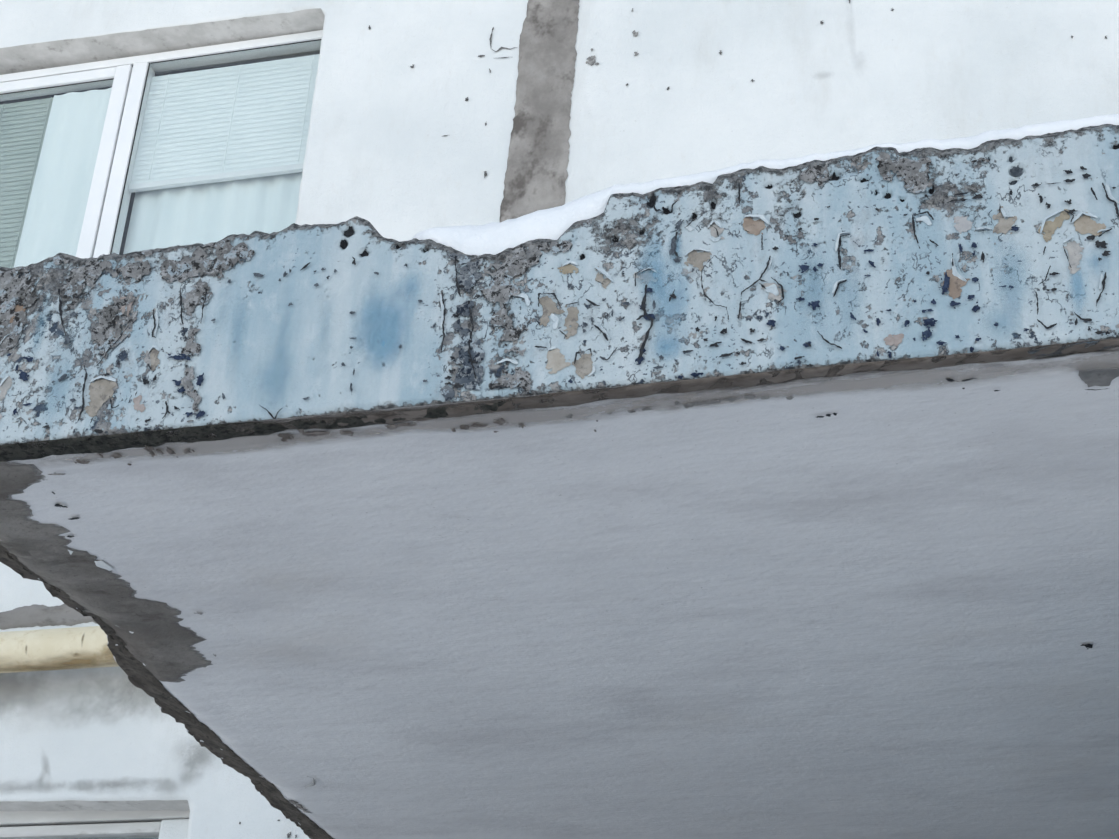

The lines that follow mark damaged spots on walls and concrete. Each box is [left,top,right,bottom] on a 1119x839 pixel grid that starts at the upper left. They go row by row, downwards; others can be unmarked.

spalling [0,240,265,433]
spalling [340,226,369,265]
spalling [440,240,664,402]
damp [0,338,1119,462]
peeling [646,194,780,365]
peeling [675,395,770,409]
peeling [759,277,820,310]
spalling [800,159,839,186]
peeling [850,152,1023,358]
peeling [1031,166,1112,291]
peeling [1078,364,1119,390]